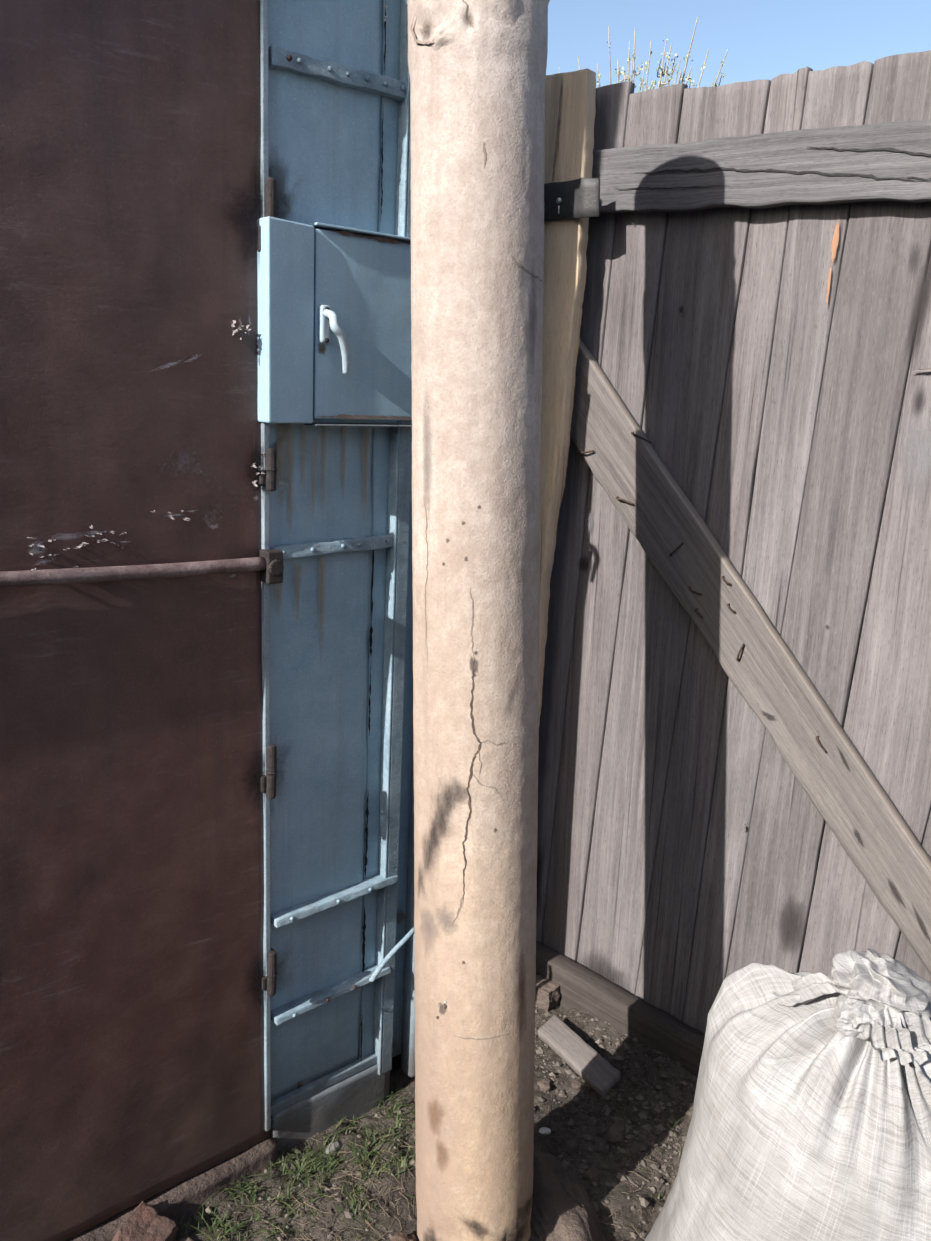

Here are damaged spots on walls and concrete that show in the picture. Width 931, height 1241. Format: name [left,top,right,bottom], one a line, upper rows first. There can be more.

peeling [27,525,129,570]
crack [452,589,507,924]
leakage [469,1222,486,1235]